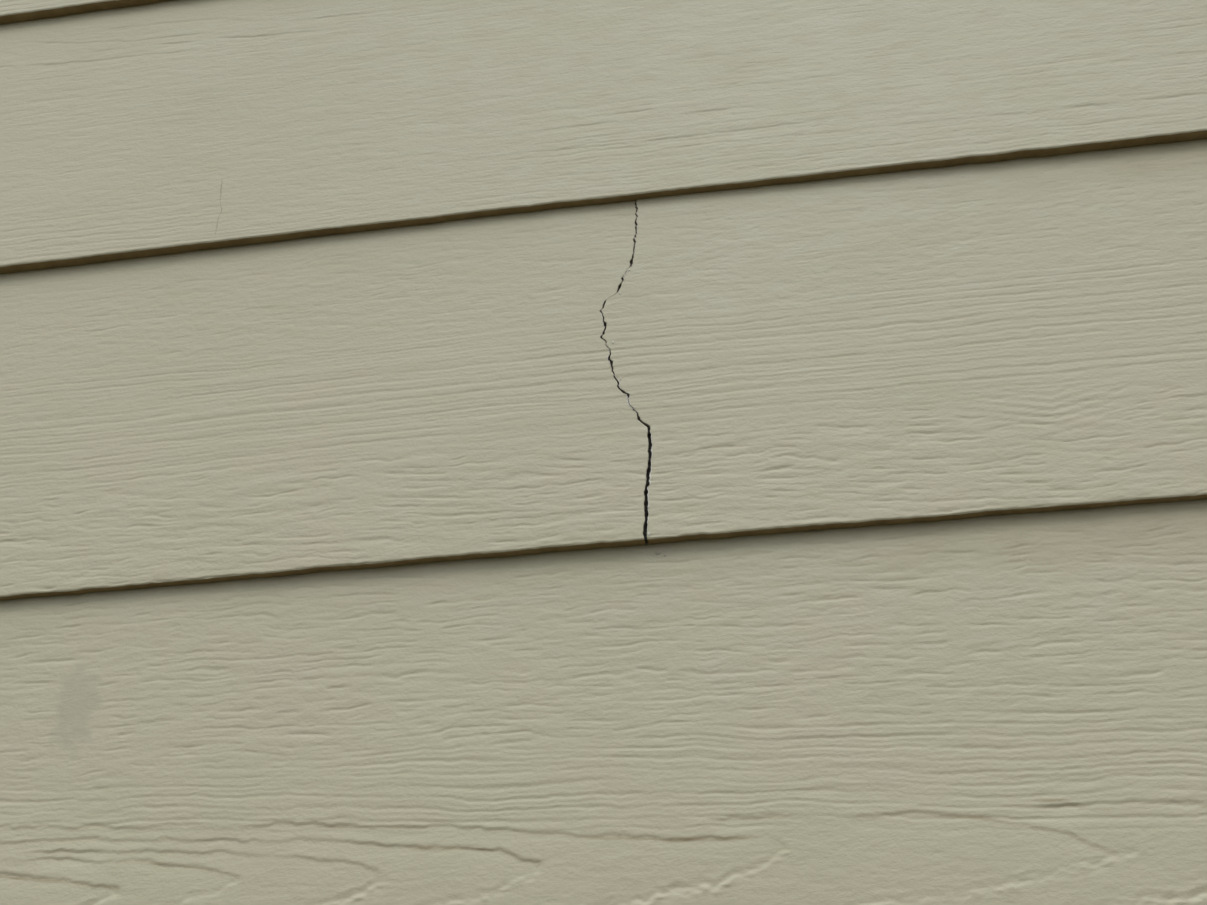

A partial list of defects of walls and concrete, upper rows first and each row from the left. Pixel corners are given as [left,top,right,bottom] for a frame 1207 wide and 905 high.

crack [600,202,666,557]